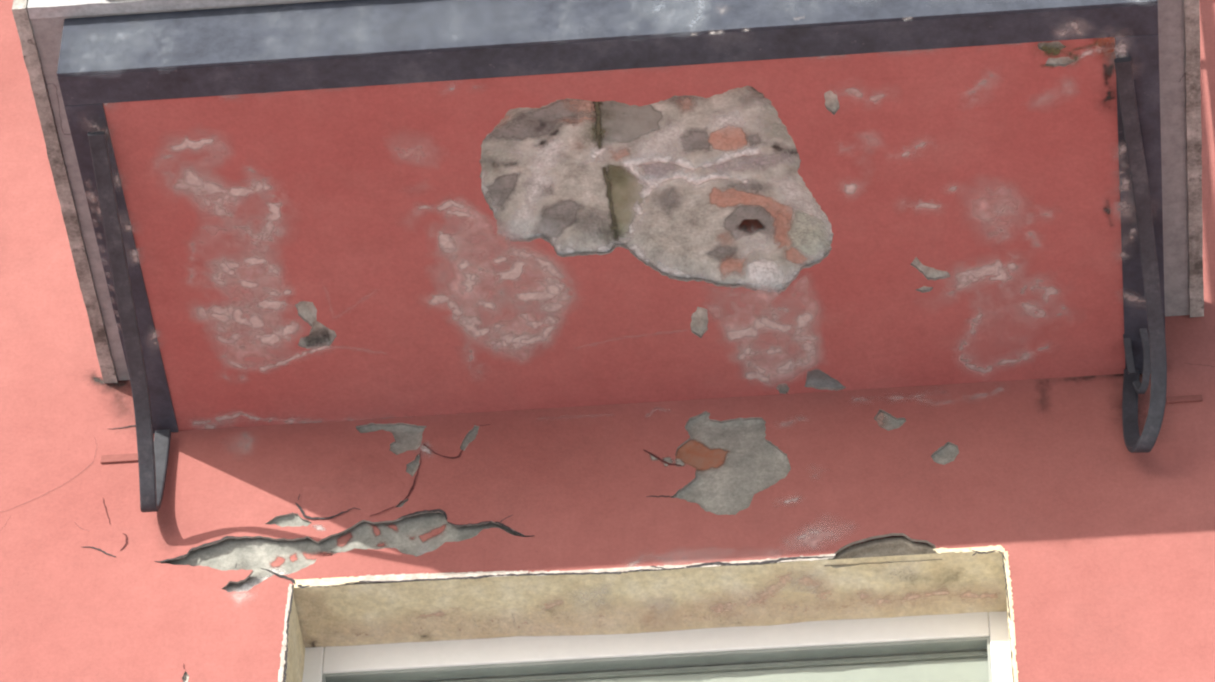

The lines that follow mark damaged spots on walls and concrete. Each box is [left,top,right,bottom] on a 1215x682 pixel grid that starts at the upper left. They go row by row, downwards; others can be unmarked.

water stain [167,138,224,157]
spalling [480,85,833,294]
water stain [175,169,329,371]
spalling [296,301,336,347]
water stain [419,200,570,361]
water stain [710,277,818,383]
peeling [356,425,430,477]
crack [295,443,535,537]
peeling [650,413,791,515]
crack [155,536,834,682]
peeling [161,501,1019,682]